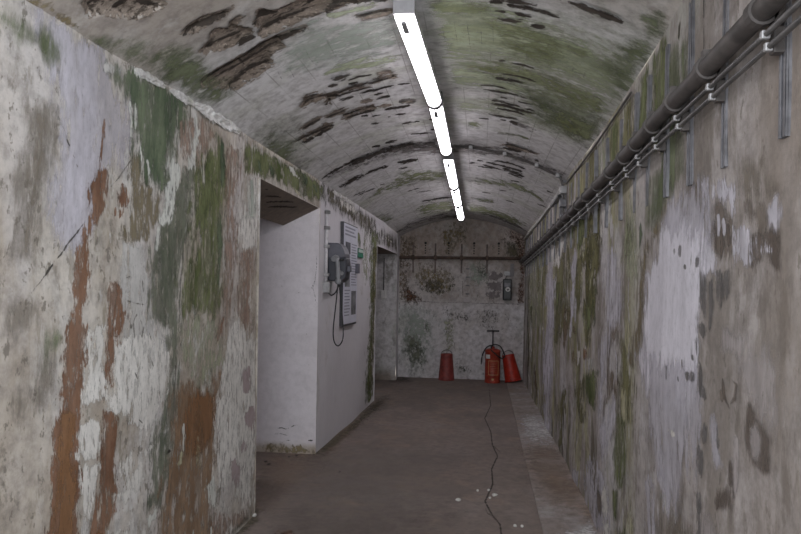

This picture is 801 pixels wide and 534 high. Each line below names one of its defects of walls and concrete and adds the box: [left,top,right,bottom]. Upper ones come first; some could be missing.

spalling [81,0,168,21]
spalling [179,0,393,91]
leakage [121,114,215,251]
crack [36,225,83,287]
corrosion [42,119,130,534]
crack [484,385,502,534]
leakage [566,247,624,534]
leakage [629,205,667,367]
leakage [645,452,701,534]
leakage [696,424,719,476]
leakage [686,161,780,403]